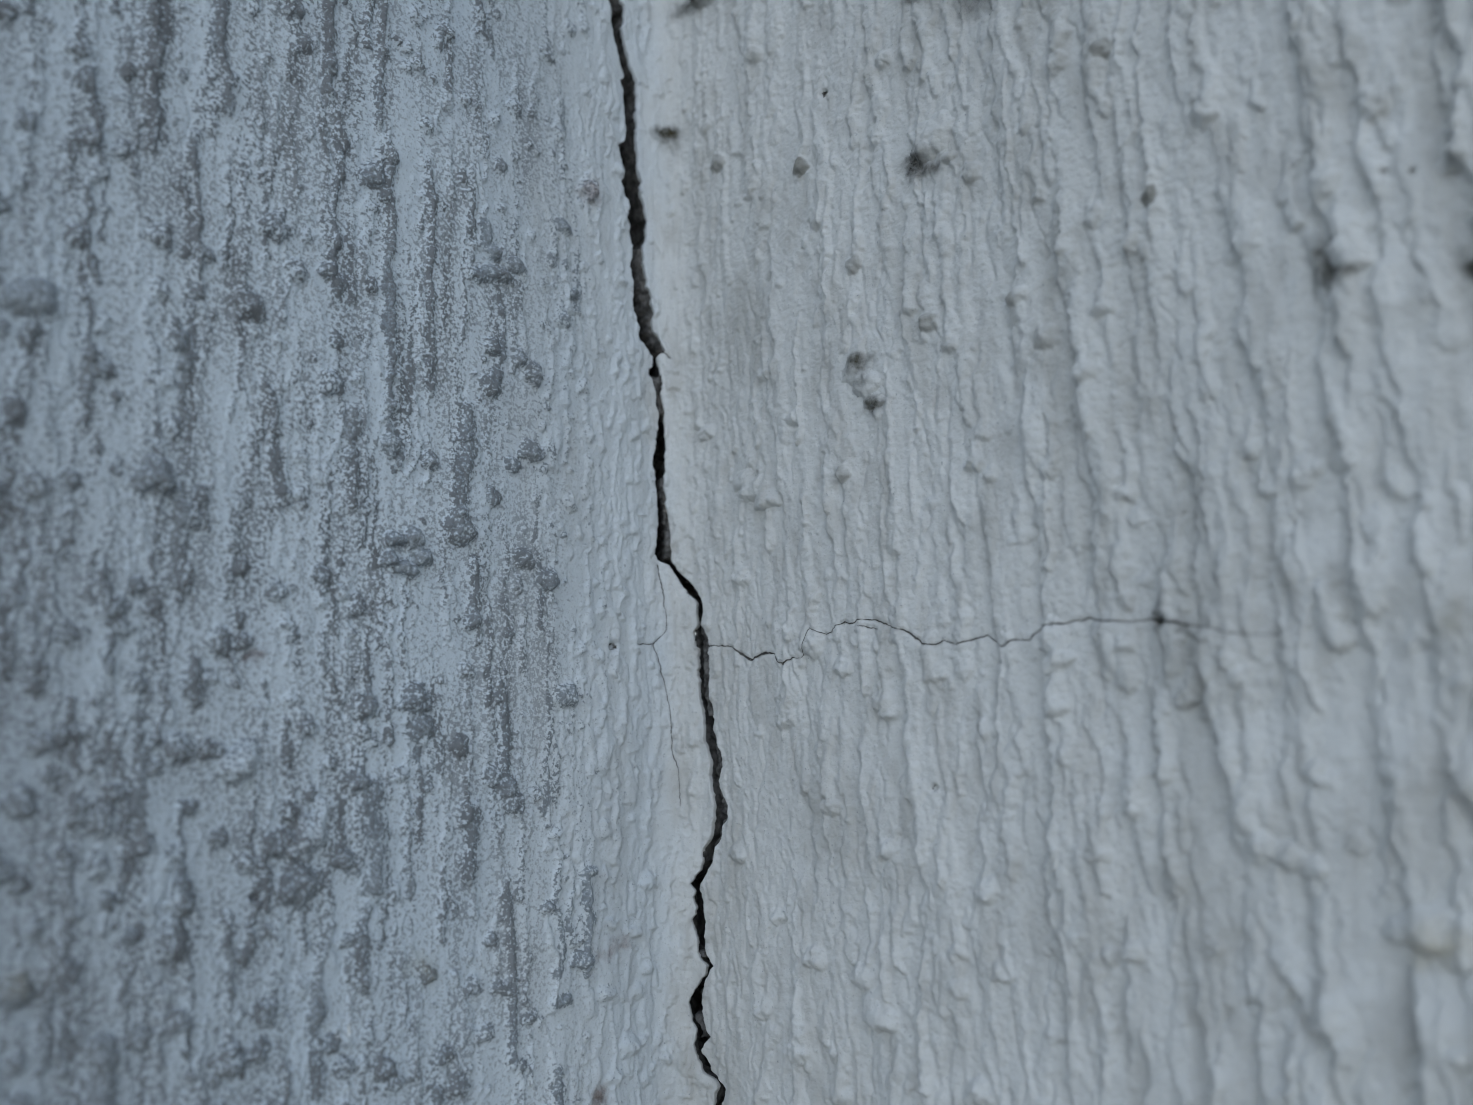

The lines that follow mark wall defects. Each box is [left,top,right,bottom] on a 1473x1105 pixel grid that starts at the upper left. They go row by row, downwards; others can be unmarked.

crack [609,0,1292,1105]